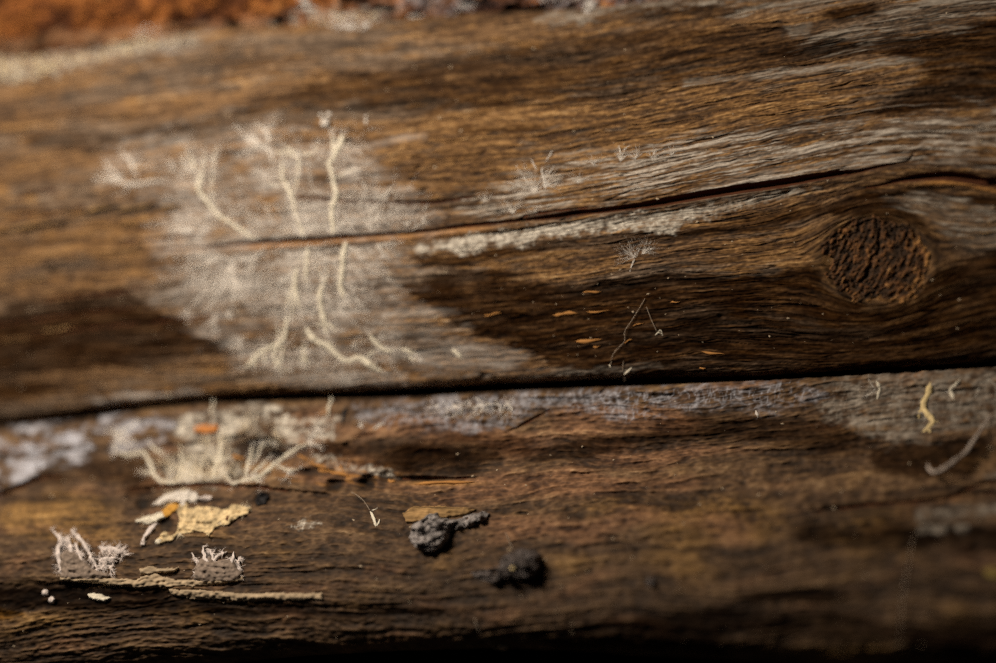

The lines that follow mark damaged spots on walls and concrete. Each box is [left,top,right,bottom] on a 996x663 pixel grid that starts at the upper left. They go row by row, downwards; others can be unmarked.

crack [121,154,996,251]
leakage [0,111,996,439]
leakage [0,424,93,482]
leakage [96,401,337,484]